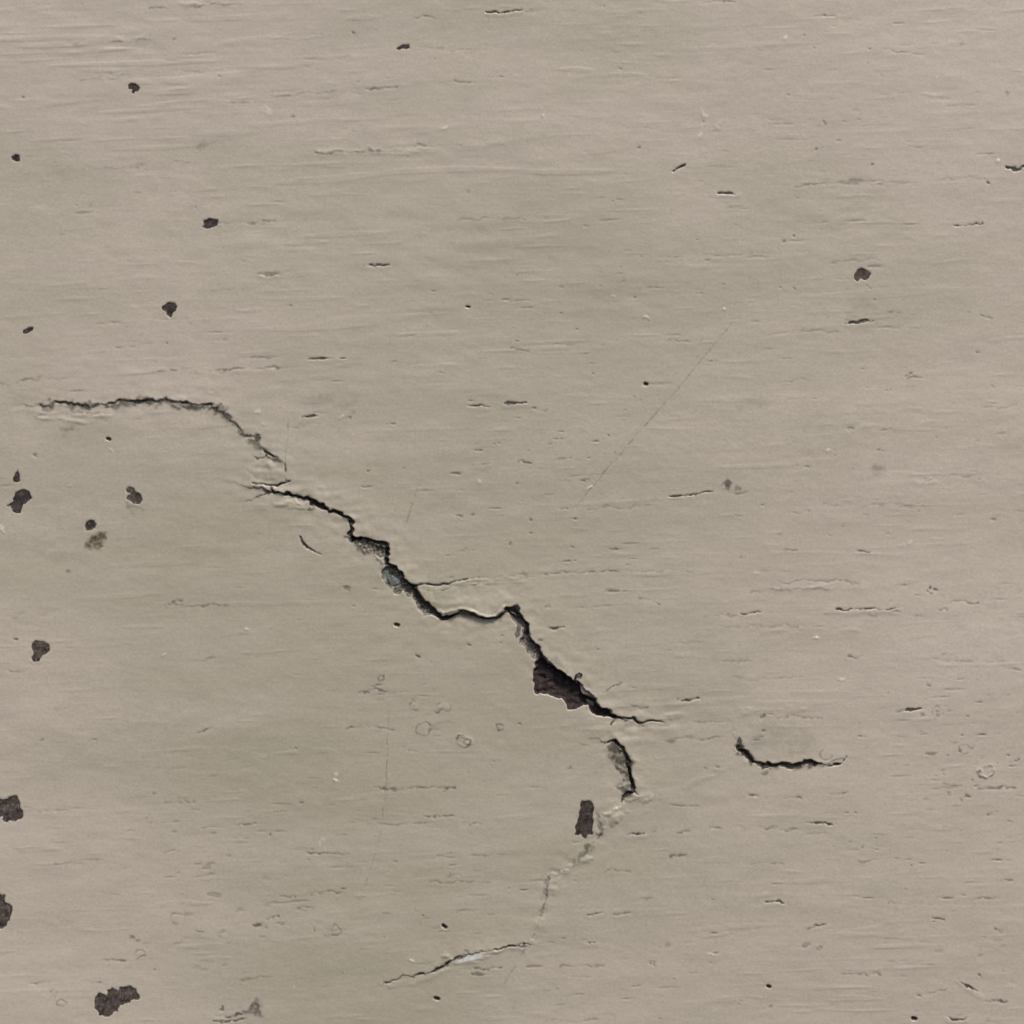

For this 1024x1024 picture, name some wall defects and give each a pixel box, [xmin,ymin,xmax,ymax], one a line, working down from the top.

peeling [854,268,871,281]
peeling [162,302,177,317]
peeling [7,471,32,513]
peeling [126,487,142,504]
crack [40,397,661,803]
peeling [31,640,50,662]
crack [736,738,847,769]
peeling [0,795,23,822]
peeling [575,800,594,838]
peeling [0,894,12,929]
peeling [94,986,140,1017]